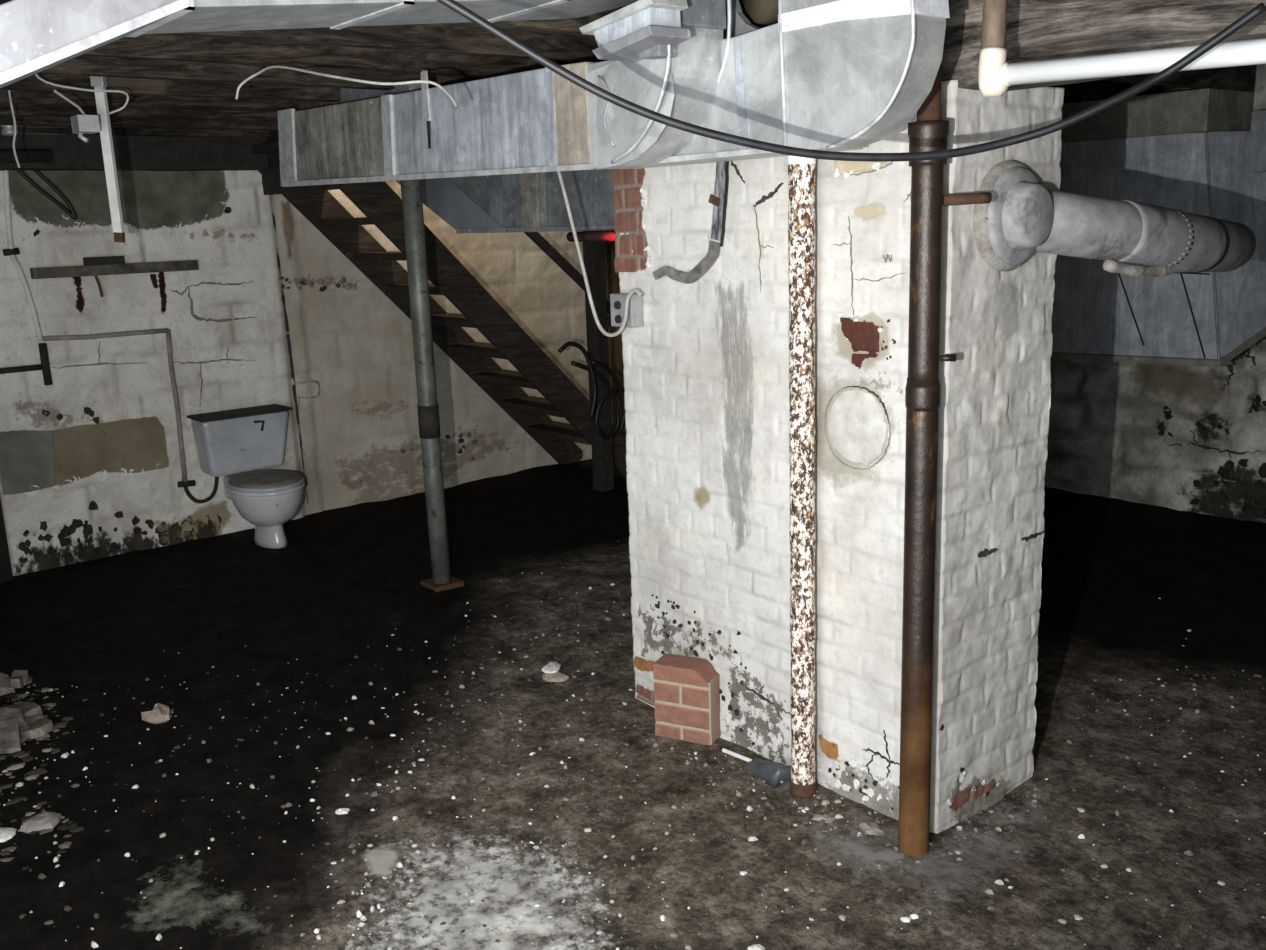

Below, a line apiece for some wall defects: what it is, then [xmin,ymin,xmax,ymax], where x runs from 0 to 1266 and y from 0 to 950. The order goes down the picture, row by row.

flaking render [611,168,652,273]
spalling [837,313,905,396]
water stain [716,286,752,548]
water stain [1181,459,1266,523]
water stain [14,500,230,574]
water stain [635,594,790,764]
corrosion [819,735,838,759]
crack [863,730,900,779]